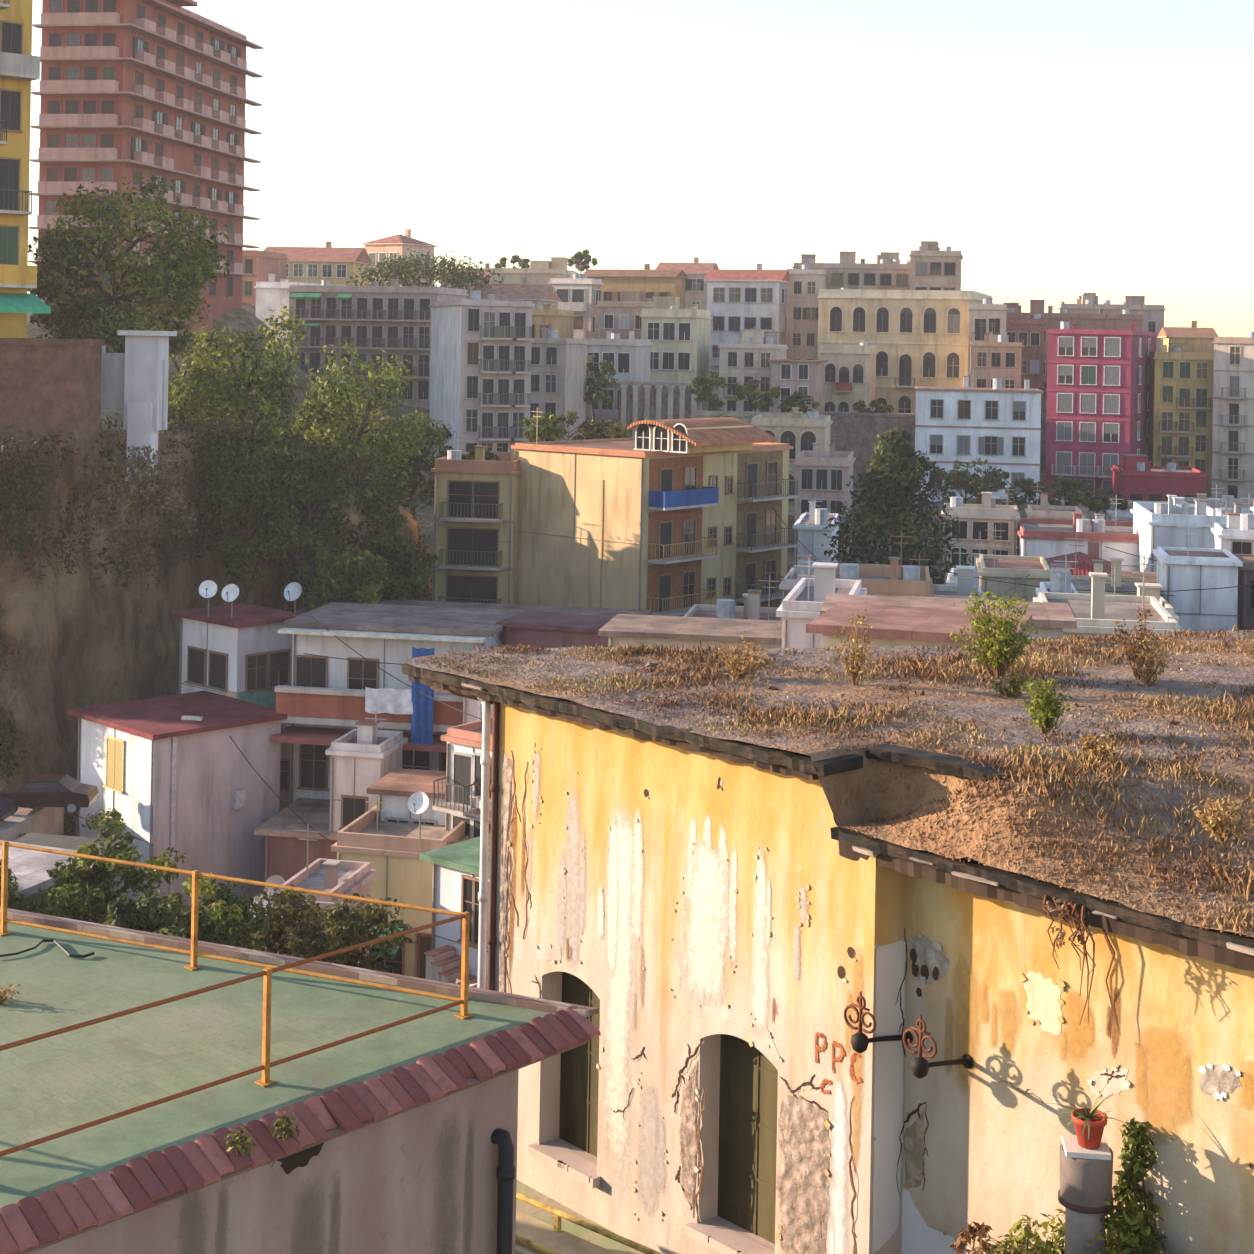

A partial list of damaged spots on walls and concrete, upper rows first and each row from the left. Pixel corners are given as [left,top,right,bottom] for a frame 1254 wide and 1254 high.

water stain [528,742,542,889]
crack [895,928,907,1058]
spalling [907,933,950,999]
peeling [1019,970,1066,1035]
corrosion [1106,989,1120,1055]
crack [671,1039,706,1222]
spalling [775,1095,831,1254]
crack [780,1074,859,1254]
crack [896,1101,929,1195]
peeling [1087,1067,1131,1099]
water stain [1136,1031,1189,1136]
peeling [1198,1062,1241,1101]